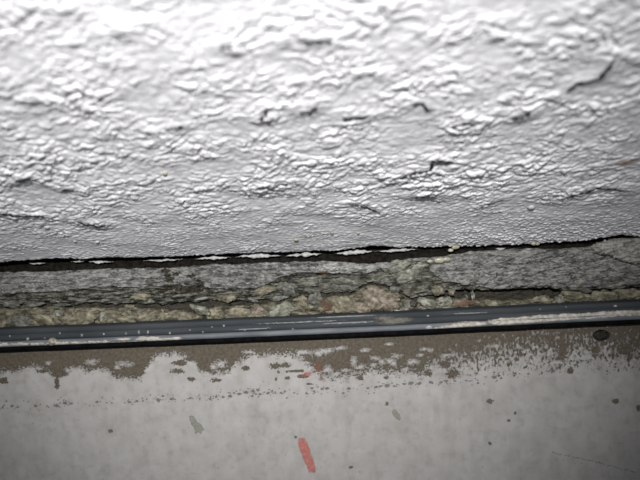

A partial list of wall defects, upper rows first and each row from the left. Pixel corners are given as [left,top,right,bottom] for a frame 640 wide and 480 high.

crack [563,57,618,96]
crack [0,234,638,285]
peeling [590,237,640,265]
spalling [0,258,523,327]
spalling [532,271,640,304]